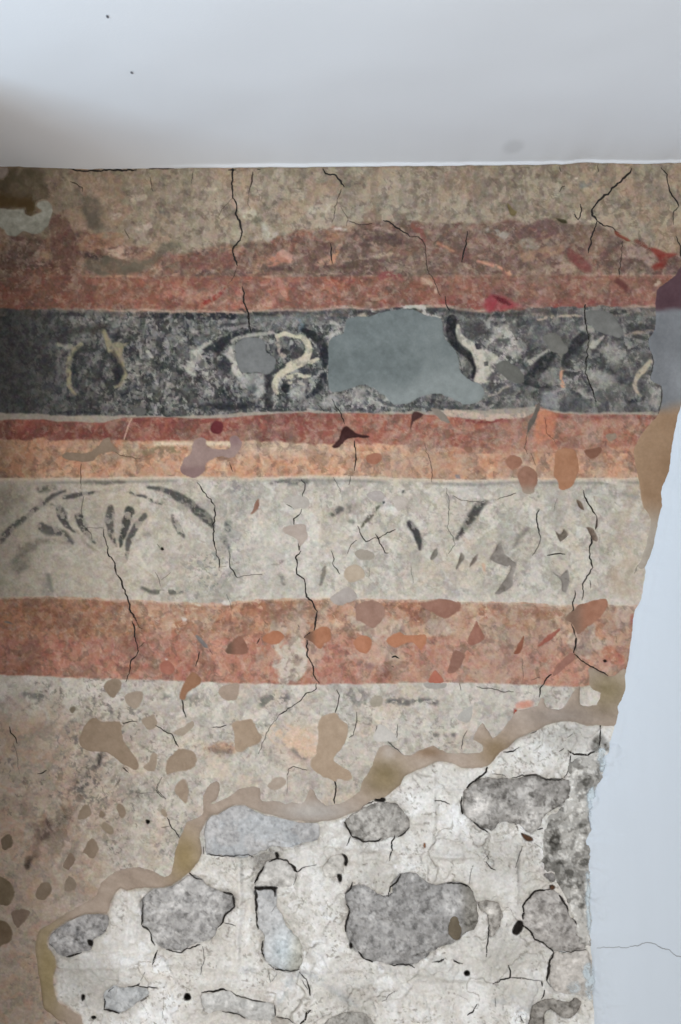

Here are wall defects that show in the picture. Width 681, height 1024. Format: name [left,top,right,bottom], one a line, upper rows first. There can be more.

flaking render [0,199,54,238]
crack [229,168,261,333]
crack [559,165,632,275]
crack [584,304,596,401]
crack [103,529,142,682]
crack [261,480,399,751]
crack [532,490,608,676]
flaking render [0,675,614,1024]